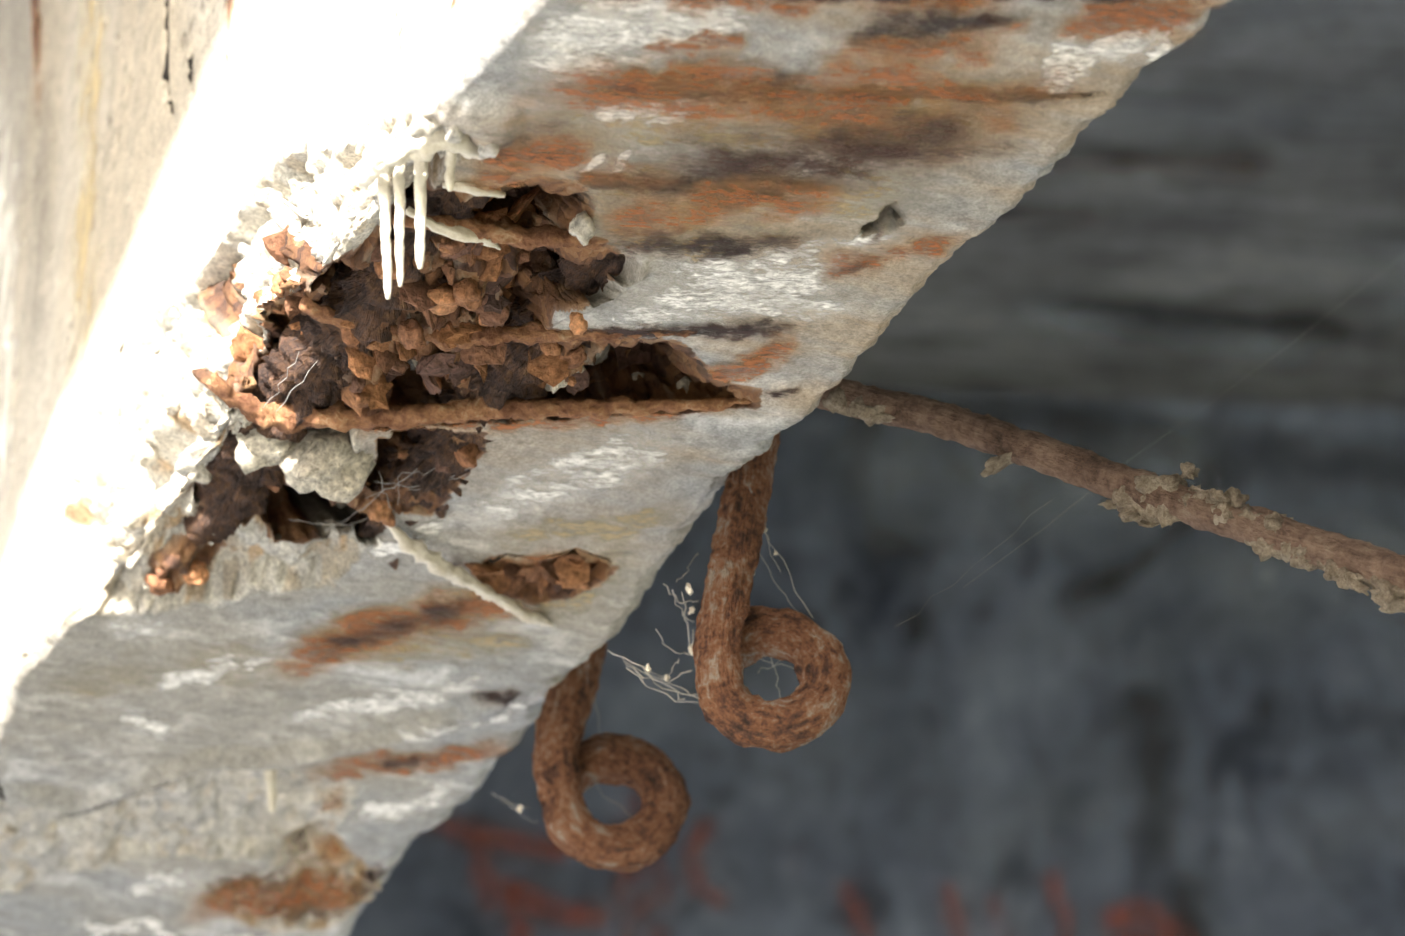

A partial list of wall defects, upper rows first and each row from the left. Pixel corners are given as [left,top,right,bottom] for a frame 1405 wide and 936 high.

rust [1058,0,1205,40]
water stain [356,129,485,189]
rust [474,0,1071,262]
water stain [442,181,506,198]
water stain [405,206,501,250]
rust [825,234,952,278]
spalling [57,100,763,624]
rust [587,318,796,383]
rust [768,389,799,398]
rust [282,590,526,676]
rust [324,743,493,781]
rust [199,801,385,936]